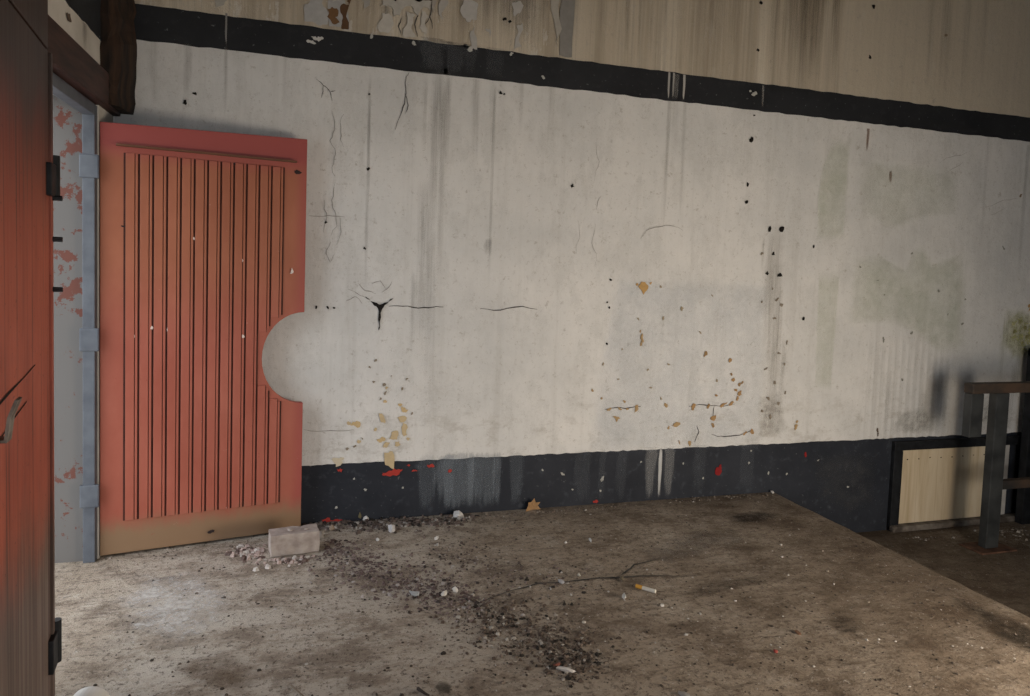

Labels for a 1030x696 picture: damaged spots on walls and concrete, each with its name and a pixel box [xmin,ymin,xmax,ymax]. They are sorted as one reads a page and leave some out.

peeling [304,0,351,44]
spalling [370,0,436,45]
peeling [460,0,491,52]
peeling [551,0,575,58]
crack [346,281,439,329]